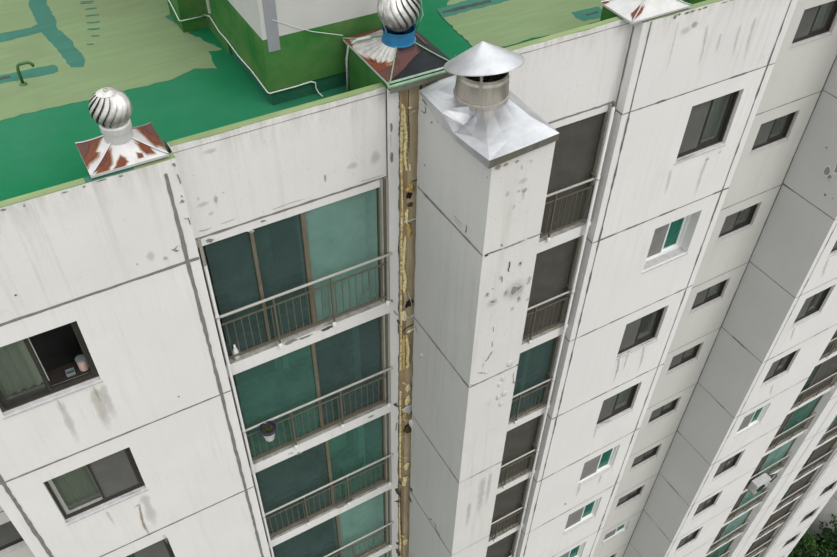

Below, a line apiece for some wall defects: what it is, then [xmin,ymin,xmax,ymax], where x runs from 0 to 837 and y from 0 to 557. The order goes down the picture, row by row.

rust [344,28,428,82]
rust [76,136,128,174]
rust [135,123,166,158]
peeling [393,403,413,434]